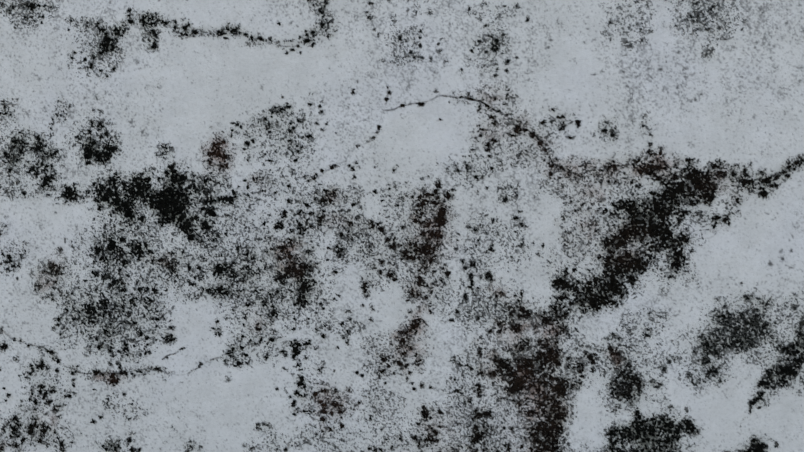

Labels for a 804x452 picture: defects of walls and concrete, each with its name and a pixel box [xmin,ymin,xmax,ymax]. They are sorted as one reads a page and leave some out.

crack [303,125,381,182]
crack [384,85,581,177]
leakage [0,93,752,452]
crack [27,344,183,390]
leakage [679,294,804,413]
leakage [724,434,779,452]